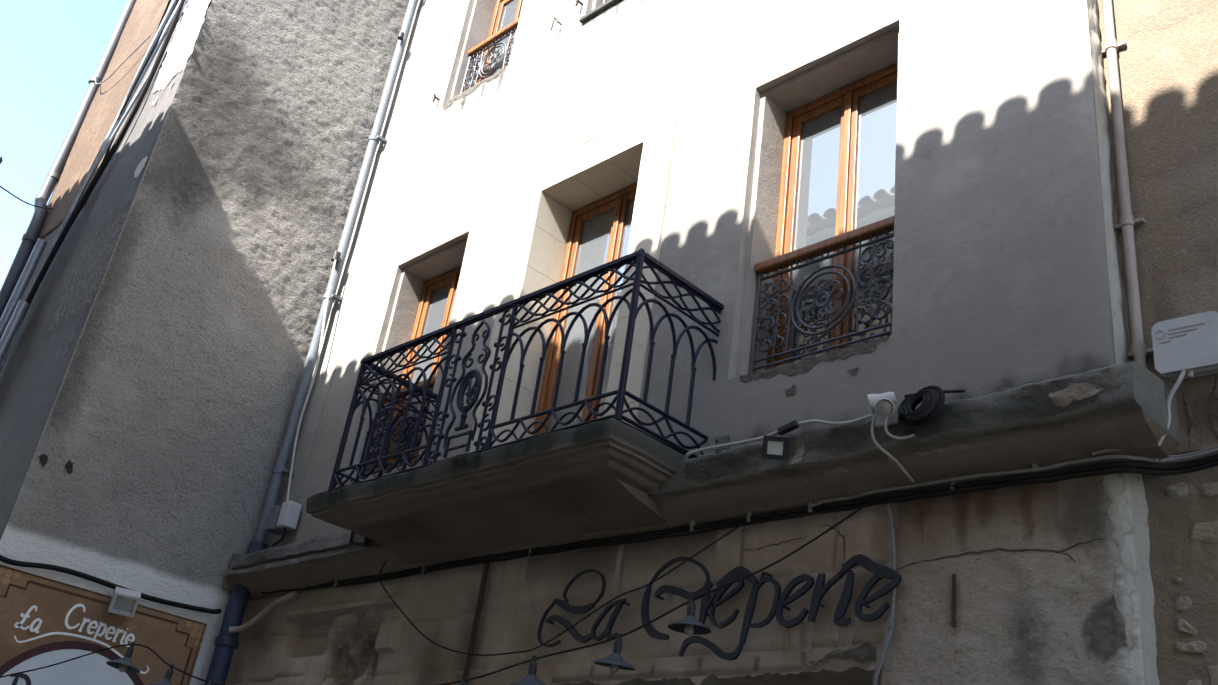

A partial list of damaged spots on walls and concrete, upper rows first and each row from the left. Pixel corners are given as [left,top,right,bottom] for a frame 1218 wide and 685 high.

flaking render [152,0,211,105]
water stain [157,52,293,186]
crack [897,538,1108,569]